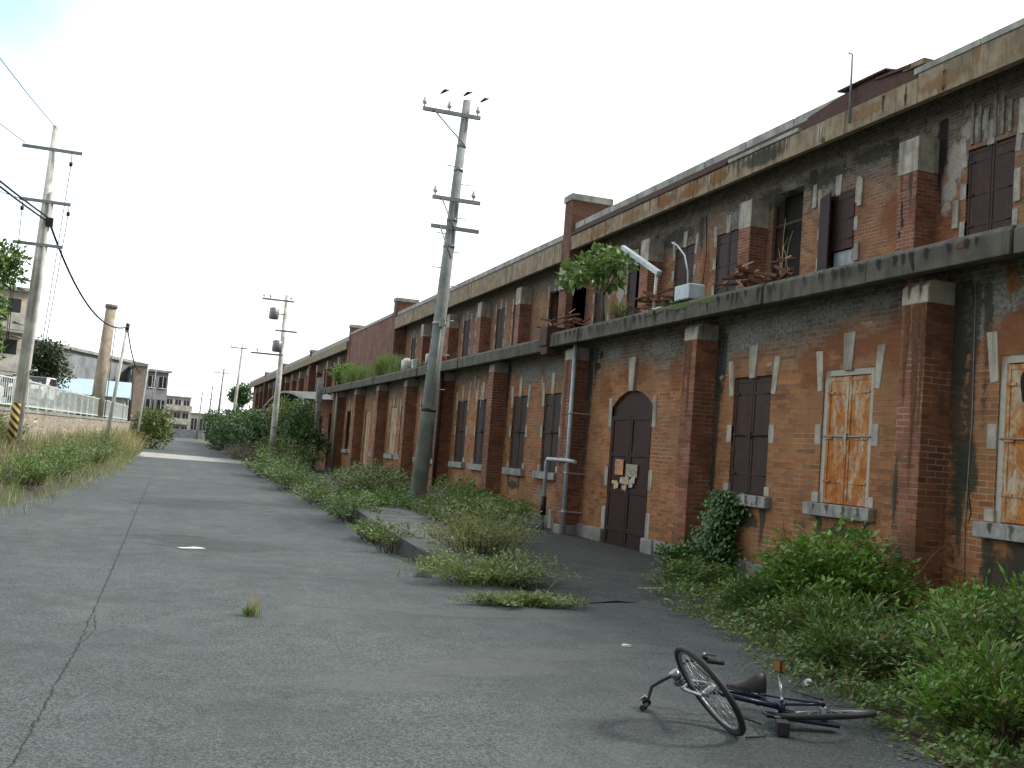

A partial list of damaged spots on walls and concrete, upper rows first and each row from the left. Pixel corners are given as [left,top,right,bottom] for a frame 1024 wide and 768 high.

water stain [948,273,1024,560]